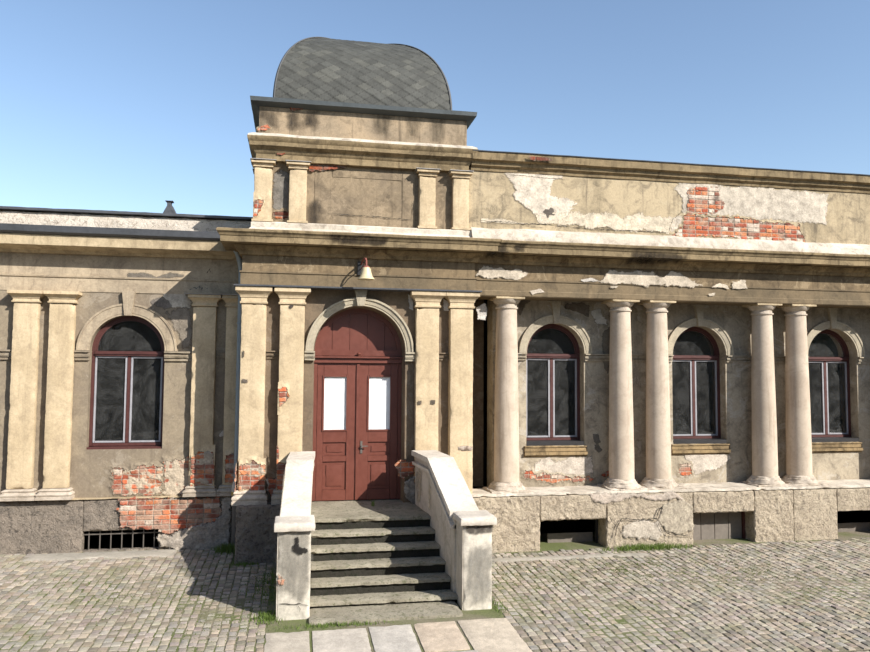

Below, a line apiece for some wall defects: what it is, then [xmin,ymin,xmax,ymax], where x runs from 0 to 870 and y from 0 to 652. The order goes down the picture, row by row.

peeling [253,170,289,222]
flaking render [505,172,829,242]
peeling [476,265,528,280]
peeling [581,270,748,296]
flaking render [277,380,290,415]
flaking render [103,443,289,550]
flaking render [394,460,415,504]